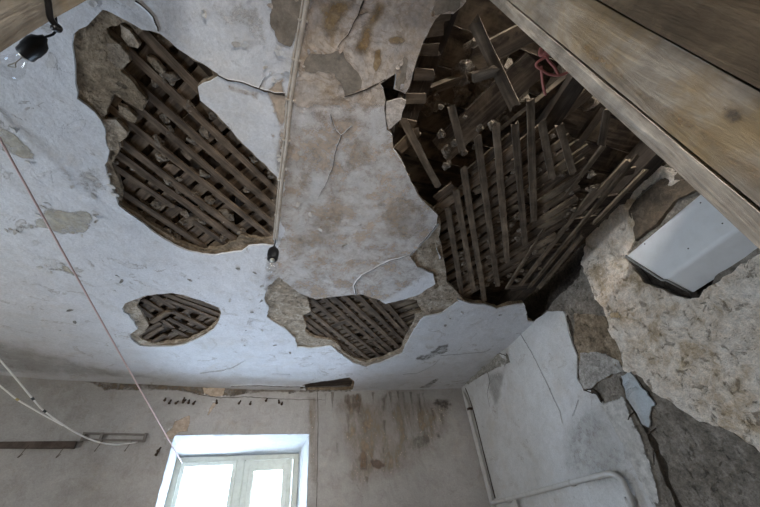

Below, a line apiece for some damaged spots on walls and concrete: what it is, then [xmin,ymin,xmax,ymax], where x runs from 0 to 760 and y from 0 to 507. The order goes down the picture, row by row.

crack [338,0,367,47]
crack [218,74,285,96]
peeling [0,123,33,164]
flaking render [73,0,278,254]
crack [318,114,352,197]
damp [271,0,466,299]
peeling [30,202,99,237]
flaking render [260,14,760,507]
flaking render [123,293,221,346]
damp [345,392,408,481]